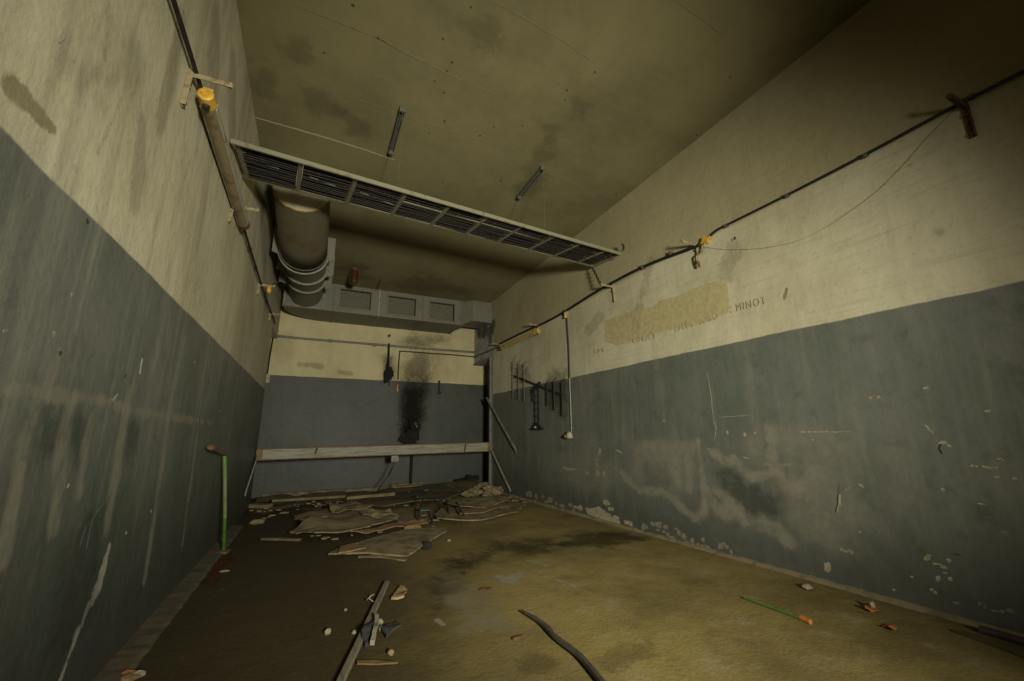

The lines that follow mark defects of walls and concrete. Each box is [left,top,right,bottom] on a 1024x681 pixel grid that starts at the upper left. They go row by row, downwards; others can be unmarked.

peeling [526,491,733,554]